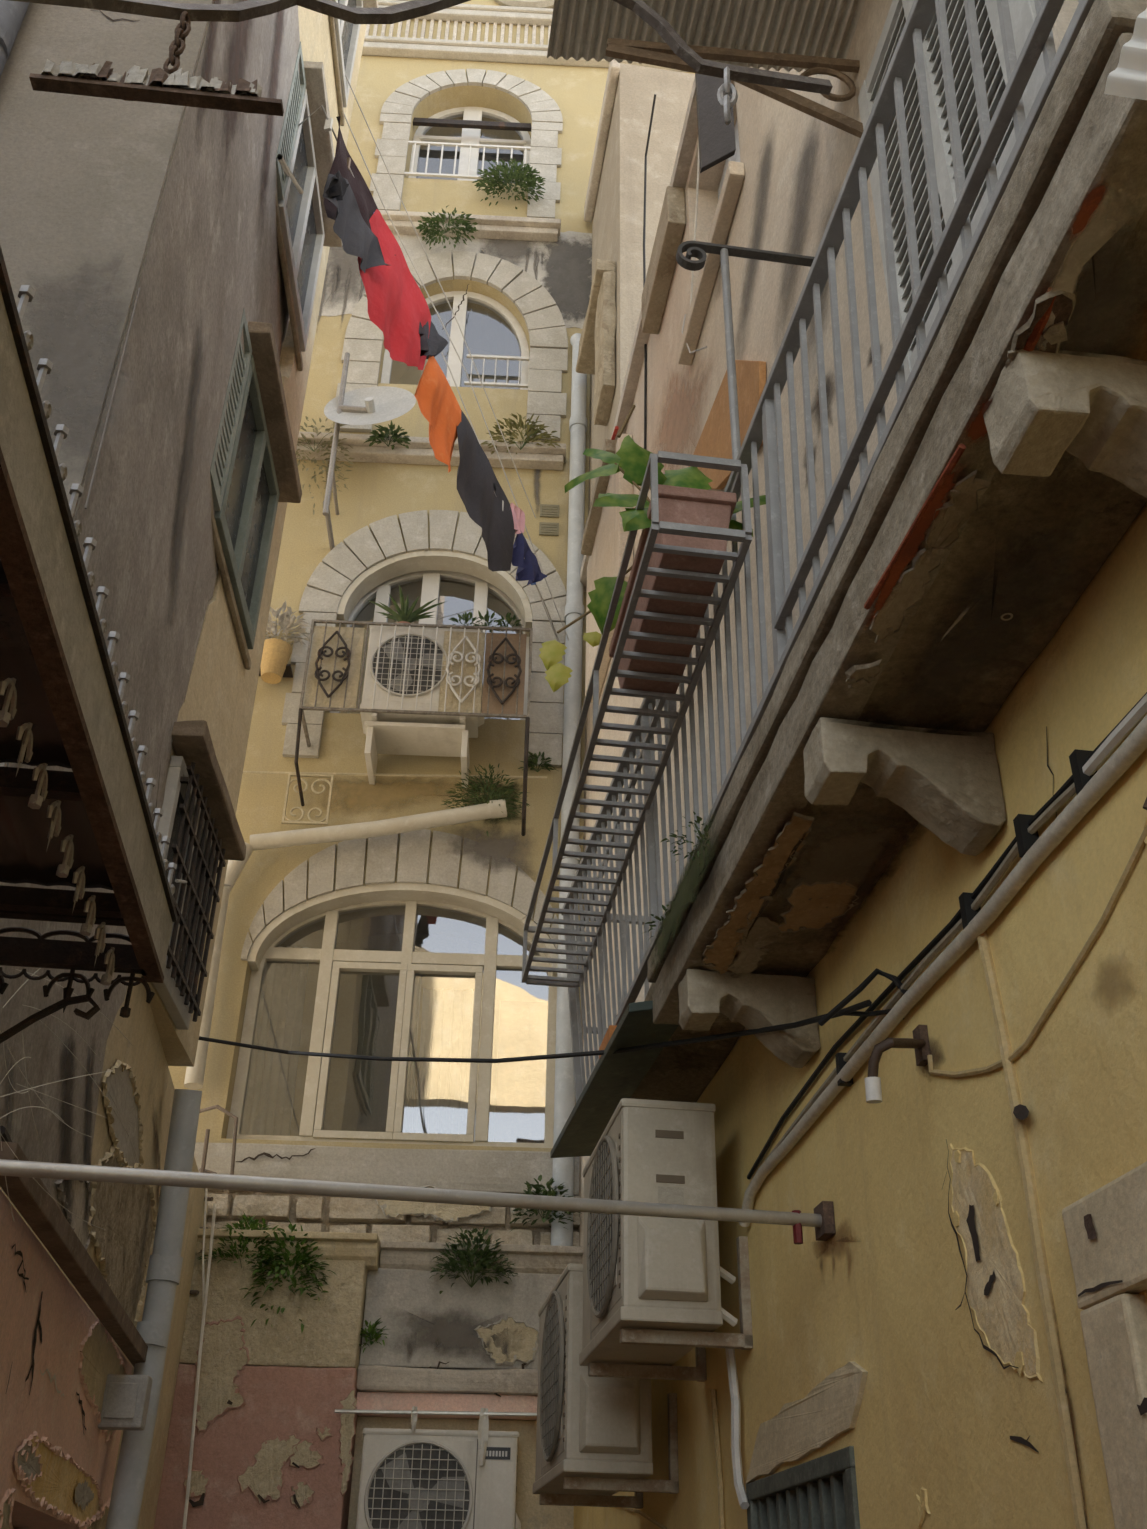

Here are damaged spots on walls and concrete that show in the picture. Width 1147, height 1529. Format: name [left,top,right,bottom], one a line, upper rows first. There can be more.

corrosion [864,396,994,626]
spalling [702,812,859,978]
flaking render [950,1144,1043,1382]
water stain [408,1312,508,1358]
flaking render [474,1315,539,1366]
flaking render [0,1431,111,1529]
flaking render [237,1388,357,1509]